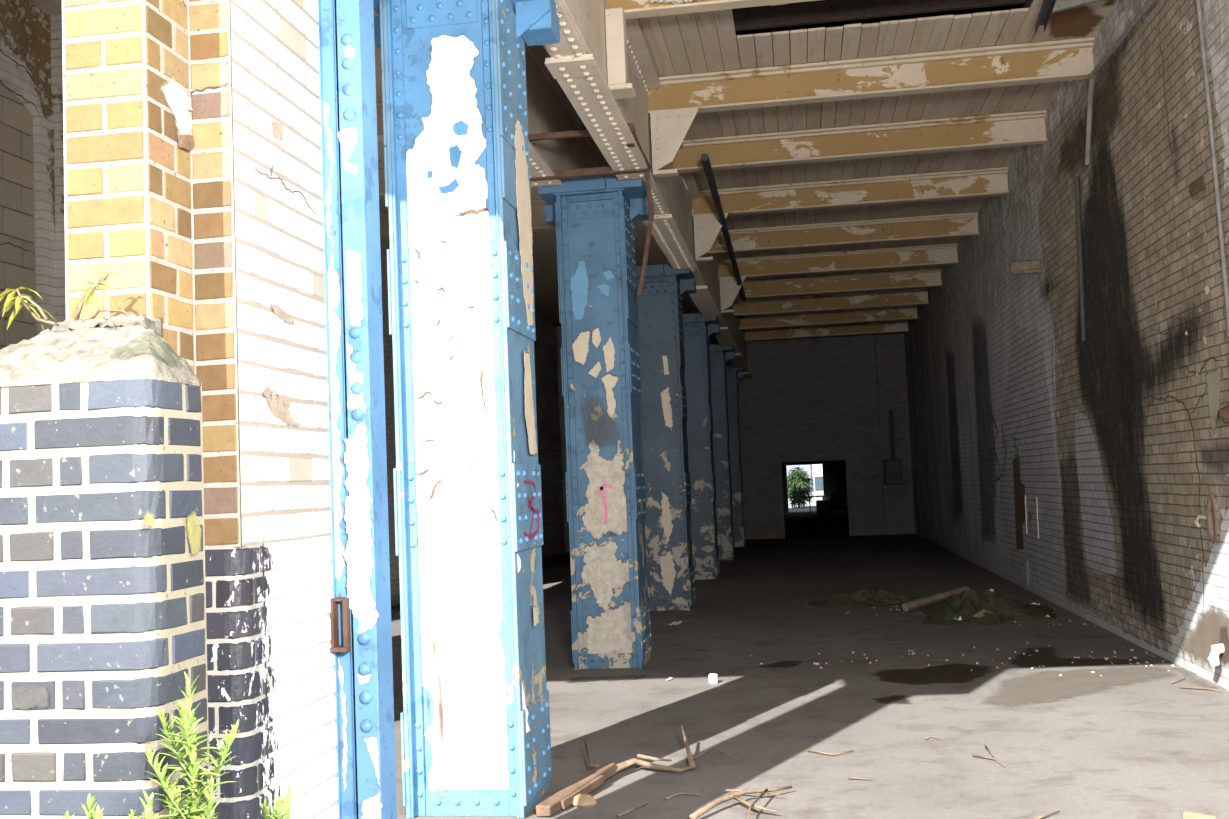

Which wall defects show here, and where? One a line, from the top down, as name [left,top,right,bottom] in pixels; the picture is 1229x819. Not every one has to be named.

peeling [0,0,65,238]
peeling [323,101,379,634]
peeling [406,34,509,789]
peeling [514,350,537,463]
peeling [572,327,620,420]
peeling [661,355,673,430]
leakage [1058,42,1200,631]
peeling [1039,0,1229,653]
peeling [581,438,632,654]
peeling [660,492,676,596]
peeling [338,657,372,793]
peeling [361,736,383,819]